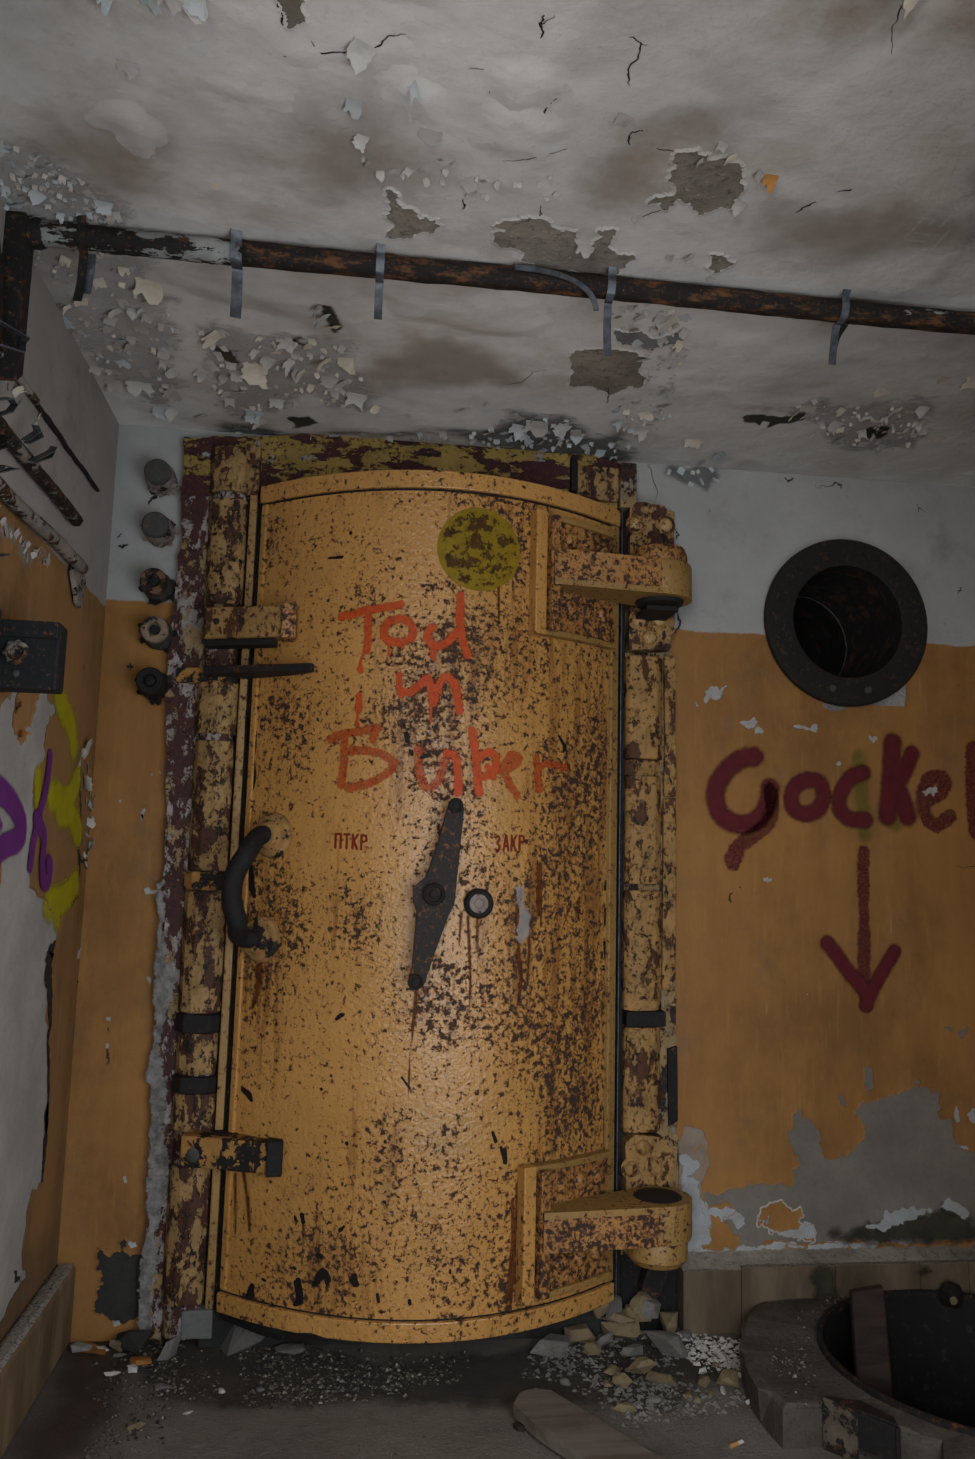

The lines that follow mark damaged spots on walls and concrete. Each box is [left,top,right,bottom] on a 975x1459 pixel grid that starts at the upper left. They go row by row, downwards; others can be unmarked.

peeling [0,138,122,228]
peeling [343,98,778,276]
peeling [56,252,381,440]
peeling [743,387,946,454]
peeling [0,692,57,1324]
rust [251,964,262,1009]
rust [459,912,479,1009]
rust [516,863,542,1006]
spalling [92,872,179,1330]
rust [234,1172,251,1234]
rust [506,1183,518,1311]
peeling [678,1064,975,1247]